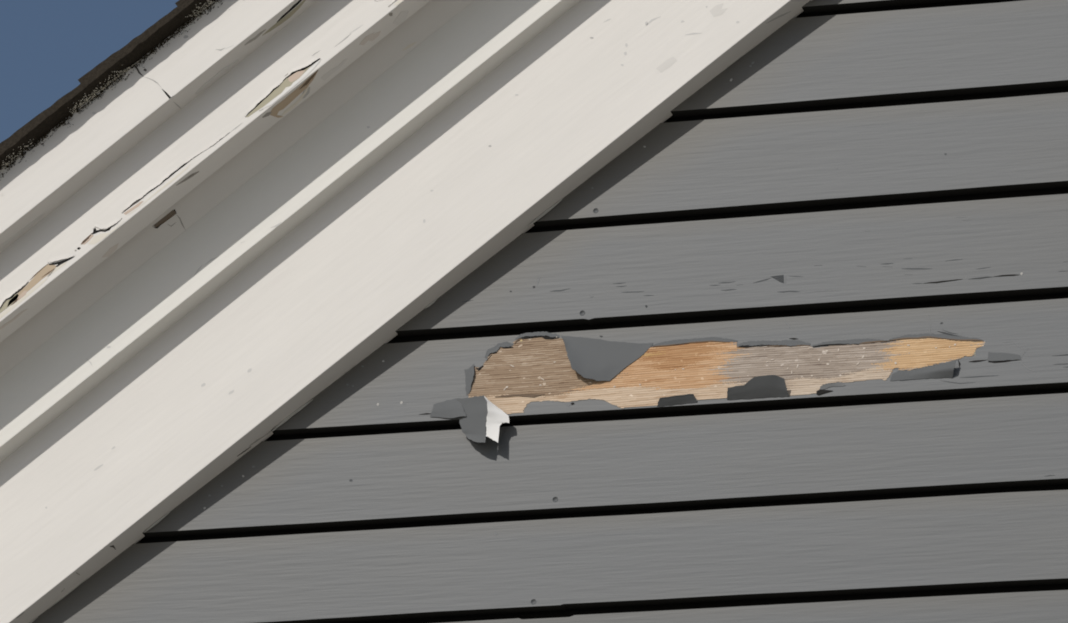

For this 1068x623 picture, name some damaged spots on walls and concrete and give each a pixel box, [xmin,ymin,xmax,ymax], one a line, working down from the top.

crack [216,0,302,51]
crack [81,25,362,244]
peeling [243,55,320,118]
peeling [0,165,190,319]
peeling [430,322,985,418]